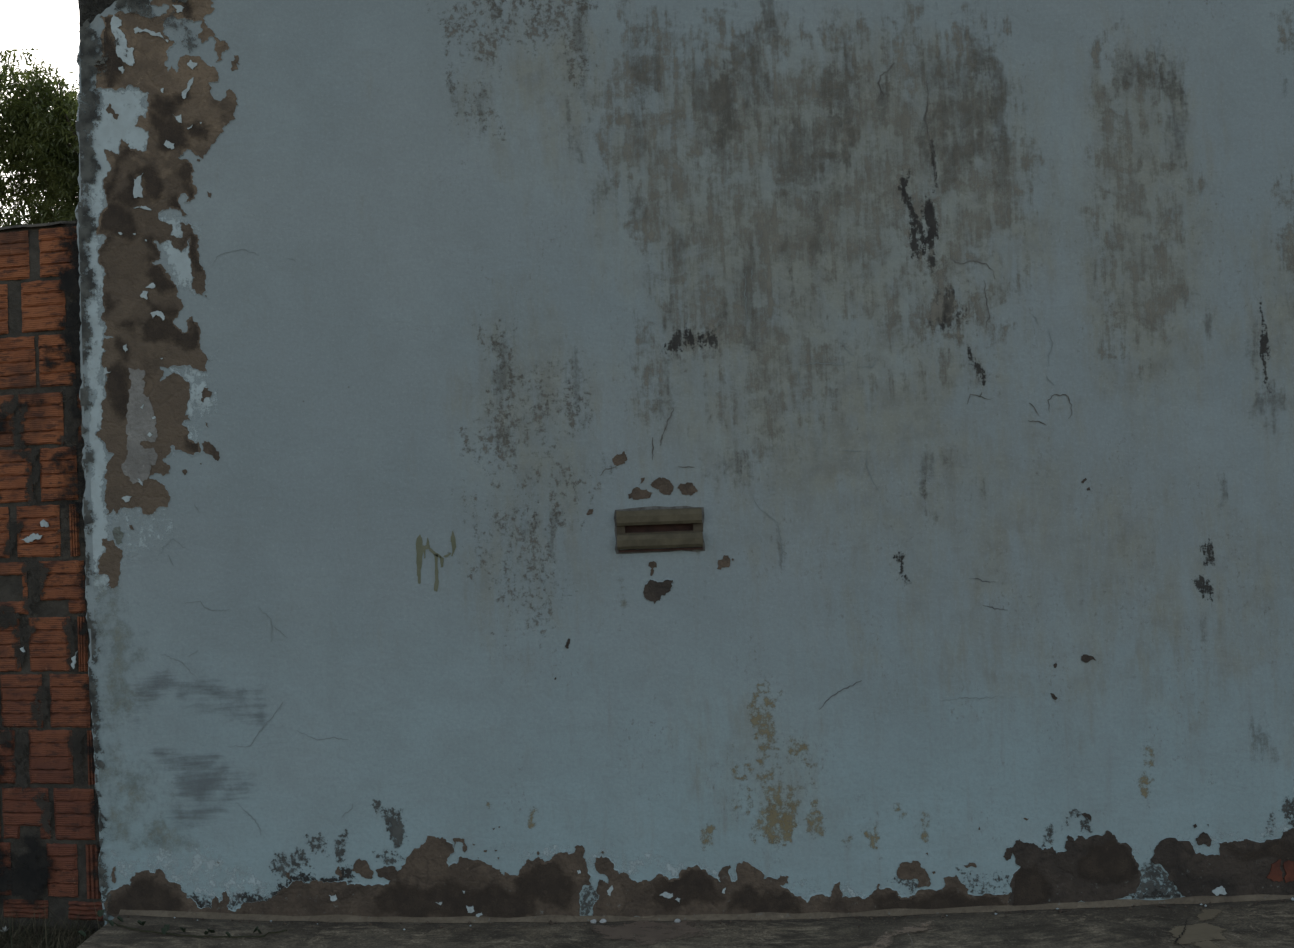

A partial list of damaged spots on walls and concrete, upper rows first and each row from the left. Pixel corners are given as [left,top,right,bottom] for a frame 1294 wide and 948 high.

damp [440,0,597,84]
damp [596,10,1043,458]
damp [1086,63,1188,339]
peeling [94,0,239,589]
damp [461,320,601,633]
peeling [628,477,698,500]
flaking render [642,561,675,604]
peeling [717,555,734,570]
peeling [103,813,1294,918]
damp [1259,798,1294,837]